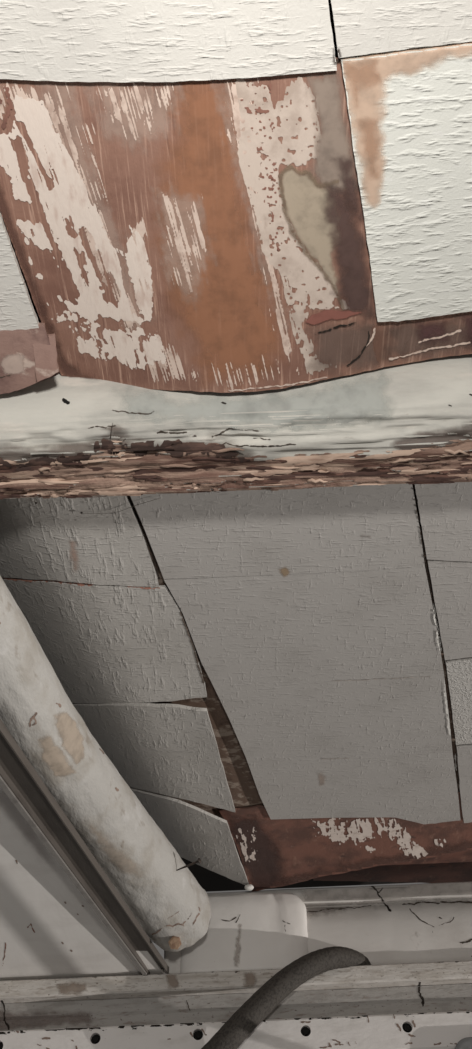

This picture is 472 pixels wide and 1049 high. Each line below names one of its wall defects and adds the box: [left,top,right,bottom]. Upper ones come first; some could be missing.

peeling [0,87,166,370]
rust [162,88,276,374]
peeling [235,76,361,375]
damp [279,42,472,364]
peeling [313,817,446,859]